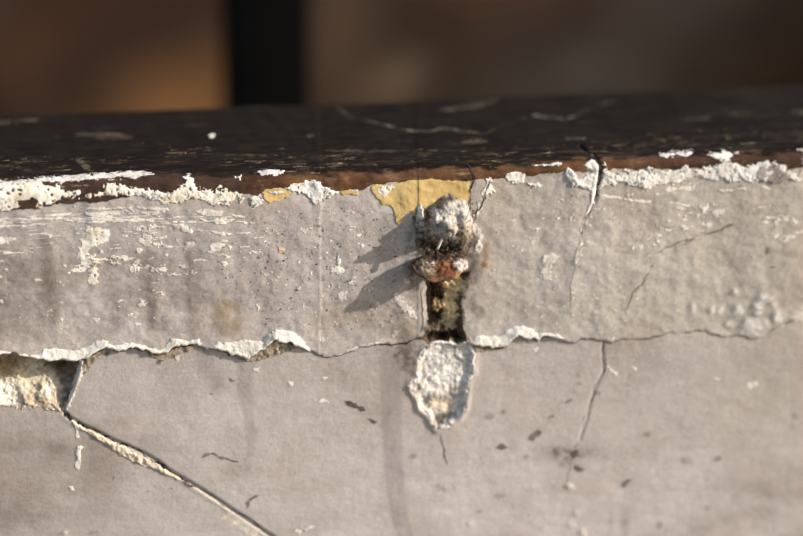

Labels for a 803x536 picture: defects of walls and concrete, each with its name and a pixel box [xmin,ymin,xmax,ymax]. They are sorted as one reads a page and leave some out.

peeling [67,227,110,285]
peeling [132,224,158,272]
peeling [171,218,233,279]
peeling [371,178,470,236]
crack [570,147,603,309]
crack [628,224,734,308]
crack [0,330,415,375]
spalling [306,220,476,430]
spalling [0,354,84,413]
crack [471,319,794,478]
crack [64,411,270,536]